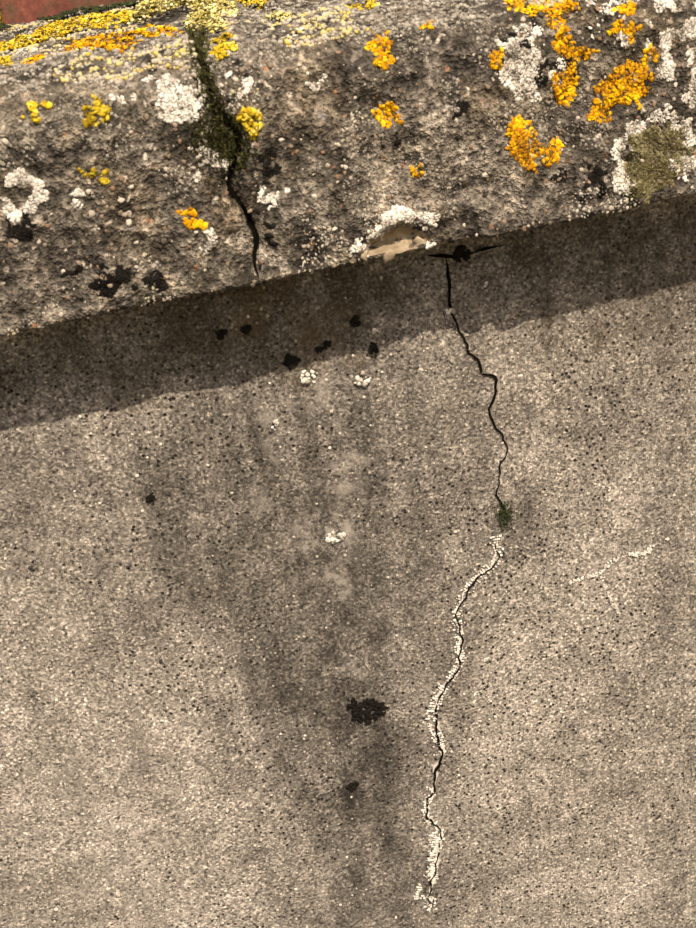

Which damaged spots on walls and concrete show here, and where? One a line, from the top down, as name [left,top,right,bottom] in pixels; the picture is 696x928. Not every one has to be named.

crack [179,25,266,278]
crack [413,245,520,912]